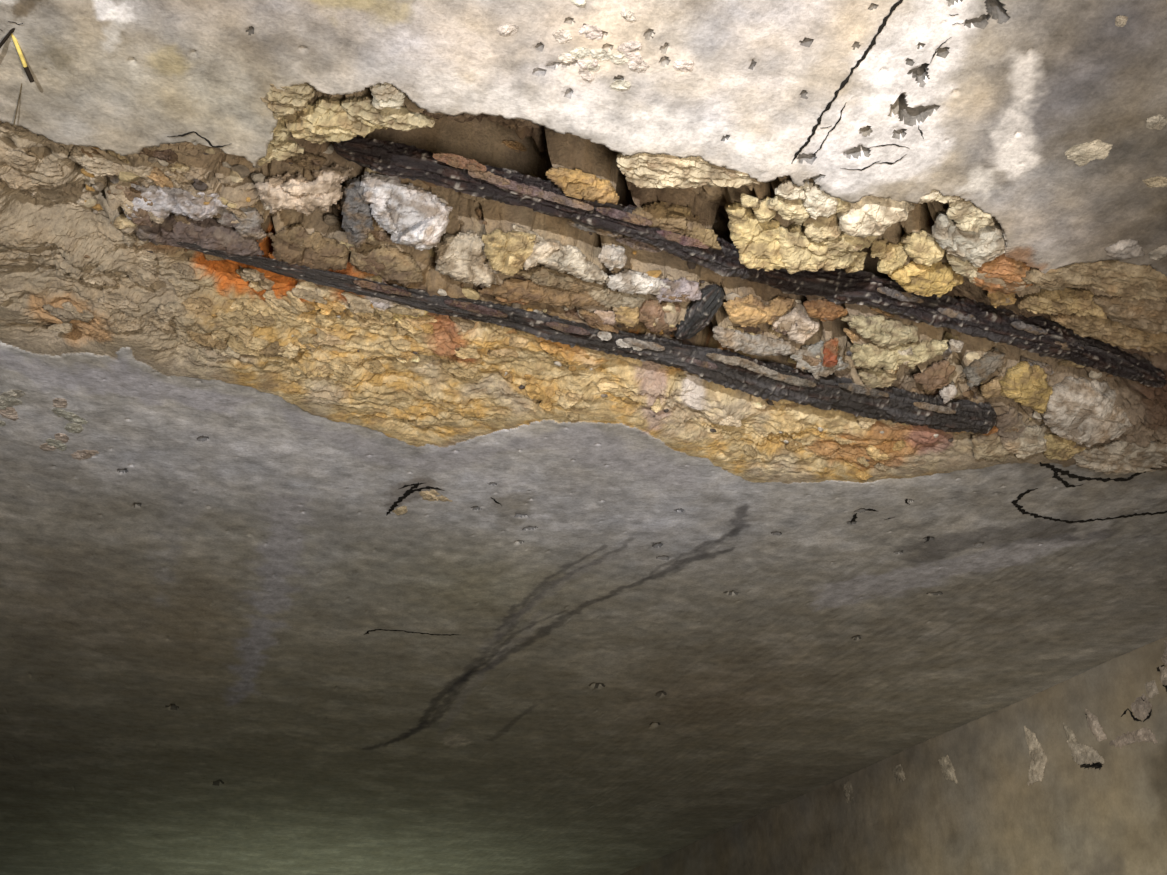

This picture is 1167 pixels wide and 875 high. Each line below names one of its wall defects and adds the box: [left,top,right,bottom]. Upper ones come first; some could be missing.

spalling [907,0,1010,87]
peeling [1115,15,1128,27]
crack [791,0,903,164]
rust [21,285,124,351]
spalling [0,82,1167,484]
rust [177,136,1167,473]
crack [1011,462,1167,524]
crack [364,628,456,636]
peeling [1063,640,1167,770]
peeling [938,755,958,784]
peeling [1024,725,1047,786]